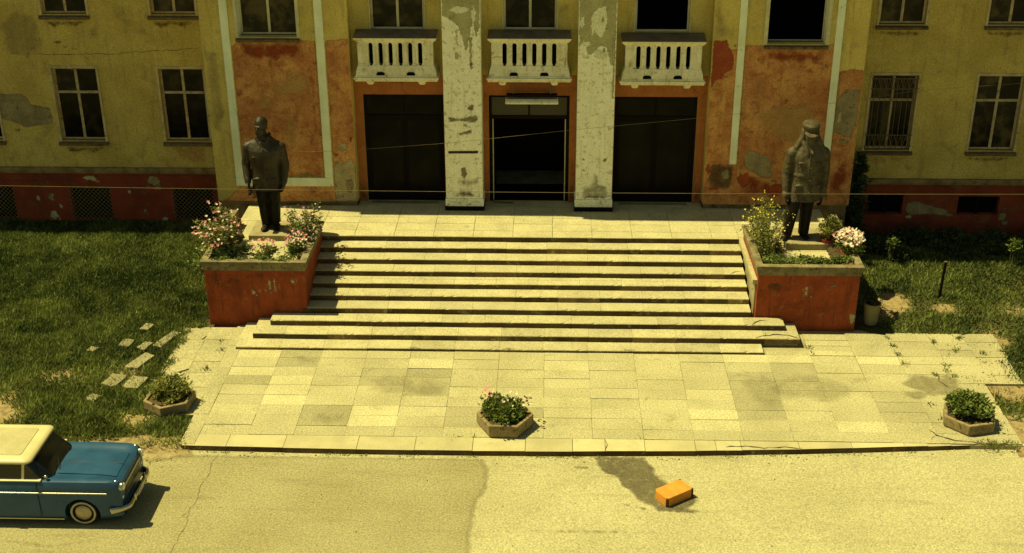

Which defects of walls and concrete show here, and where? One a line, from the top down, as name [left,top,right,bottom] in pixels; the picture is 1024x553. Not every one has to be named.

flaking render [441,0,480,69]
flaking render [579,0,617,99]
flaking render [0,94,53,131]
flaking render [448,116,478,135]
flaking render [834,89,860,143]
flaking render [334,137,365,201]
damp [706,165,733,190]
flaking render [737,151,782,197]
peeling [905,201,953,218]
damp [596,457,695,512]